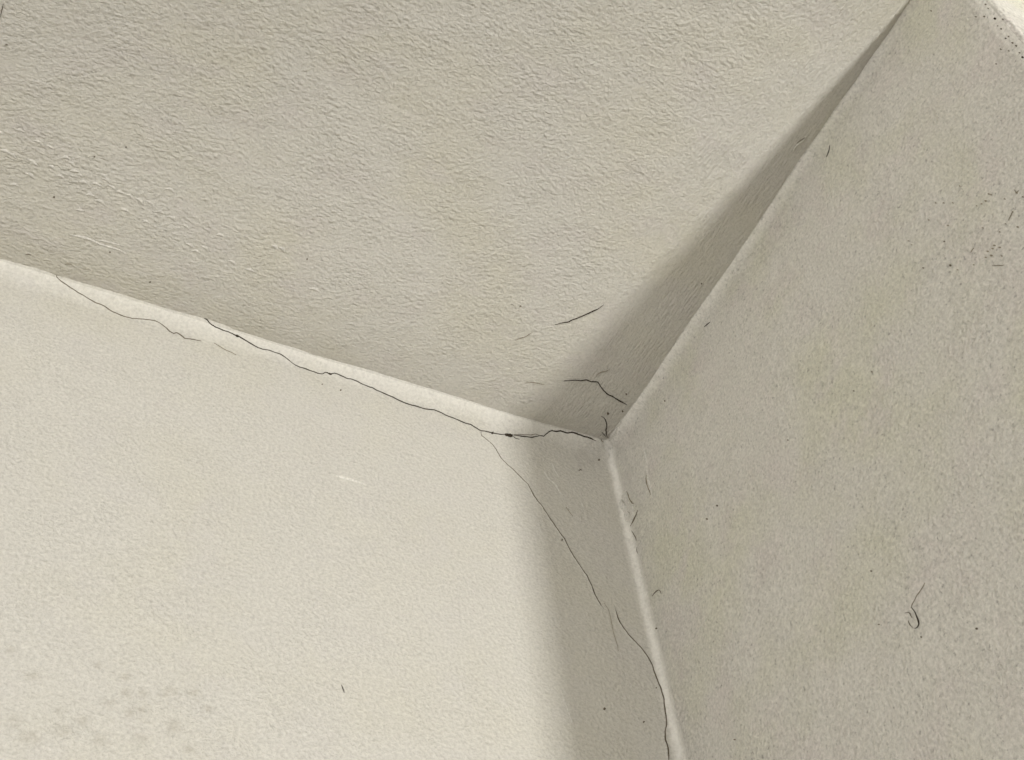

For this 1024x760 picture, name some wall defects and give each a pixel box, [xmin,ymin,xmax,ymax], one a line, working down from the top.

crack [56,275,669,760]